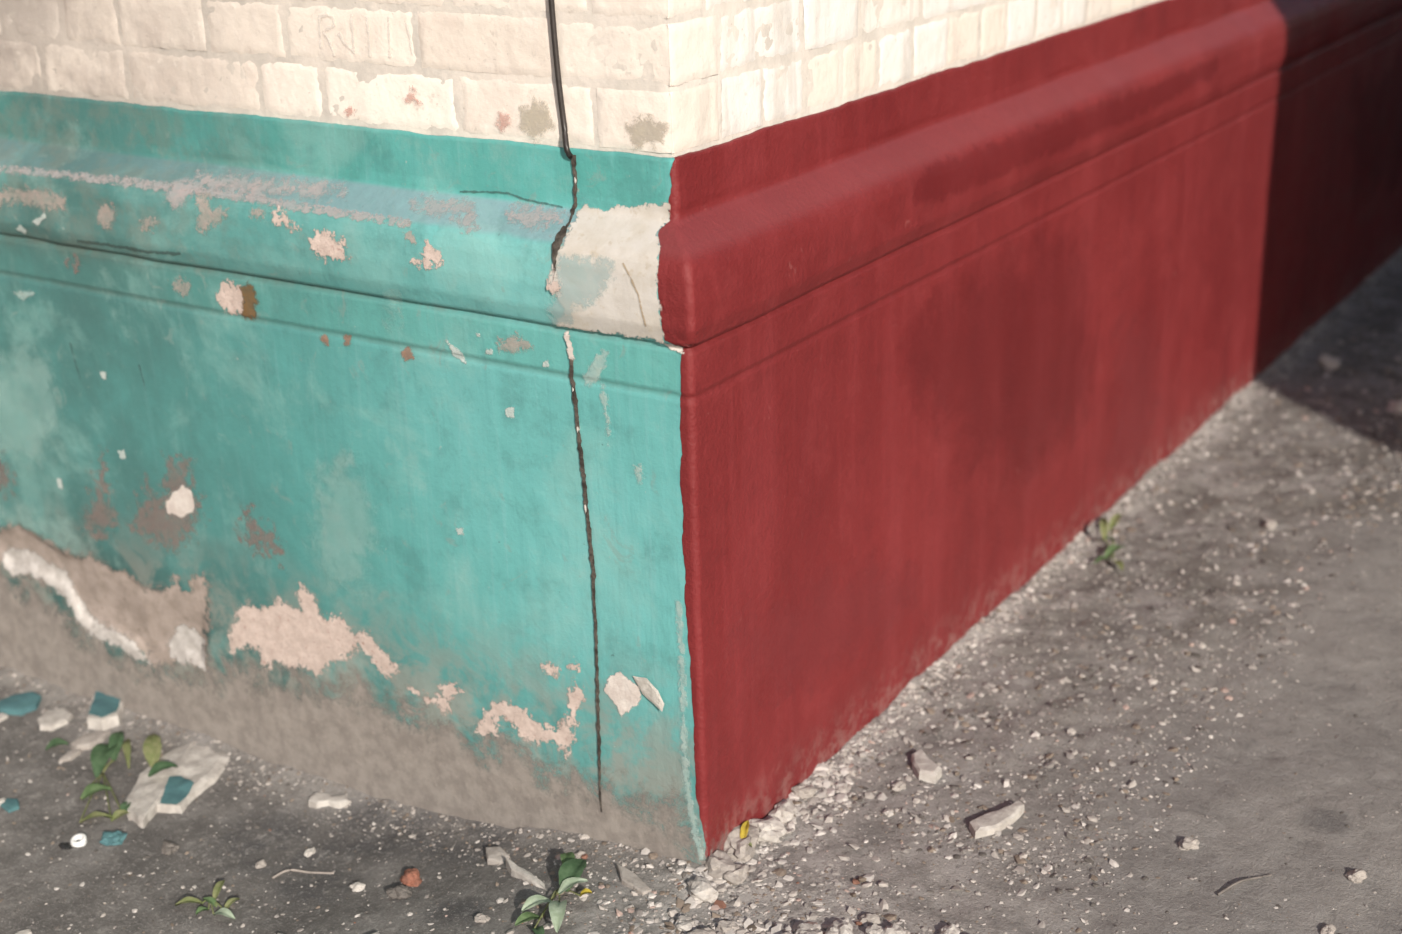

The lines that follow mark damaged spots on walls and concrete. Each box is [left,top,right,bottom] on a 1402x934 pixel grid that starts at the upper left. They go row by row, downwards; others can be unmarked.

peeling [0,165,481,271]
crack [546,155,577,297]
peeling [167,279,191,298]
peeling [215,278,244,316]
peeling [445,339,466,364]
peeling [477,331,534,355]
flaking render [505,202,684,436]
flaking render [0,520,465,717]
crack [564,331,603,813]
damp [0,572,719,865]
peeling [474,661,587,759]